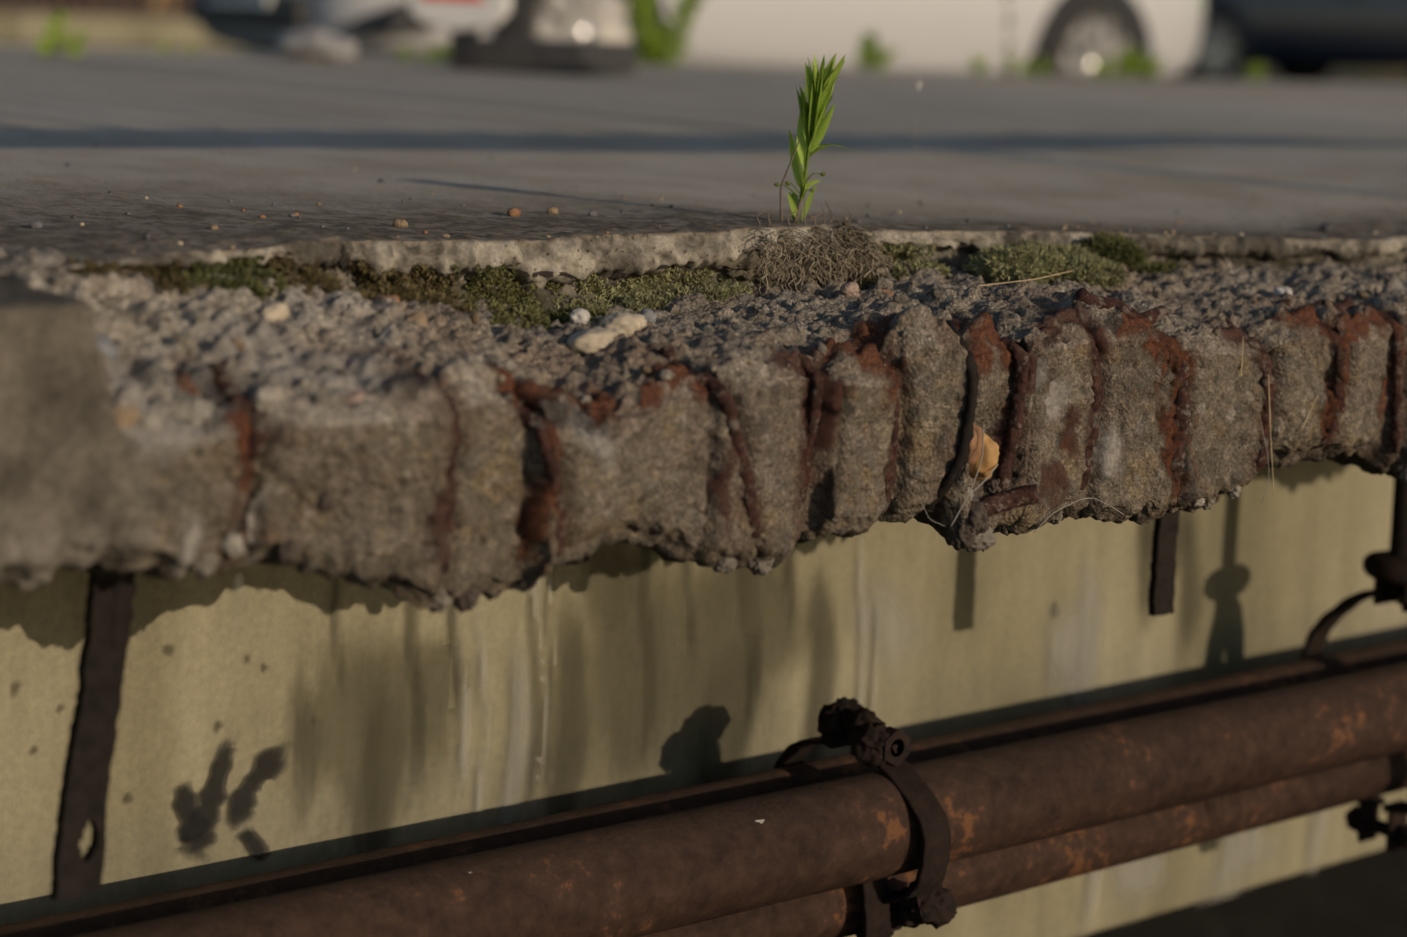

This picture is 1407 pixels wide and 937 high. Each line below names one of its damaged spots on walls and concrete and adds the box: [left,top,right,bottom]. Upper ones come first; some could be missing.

corrosion [489,364,617,463]
corrosion [639,362,710,409]
spalling [0,247,1407,614]
corrosion [771,313,908,502]
corrosion [950,312,1037,394]
corrosion [994,406,1011,450]
corrosion [1030,302,1199,510]
corrosion [1272,304,1405,440]
corrosion [516,483,558,570]
corrosion [707,443,737,529]
damp [304,651,485,850]